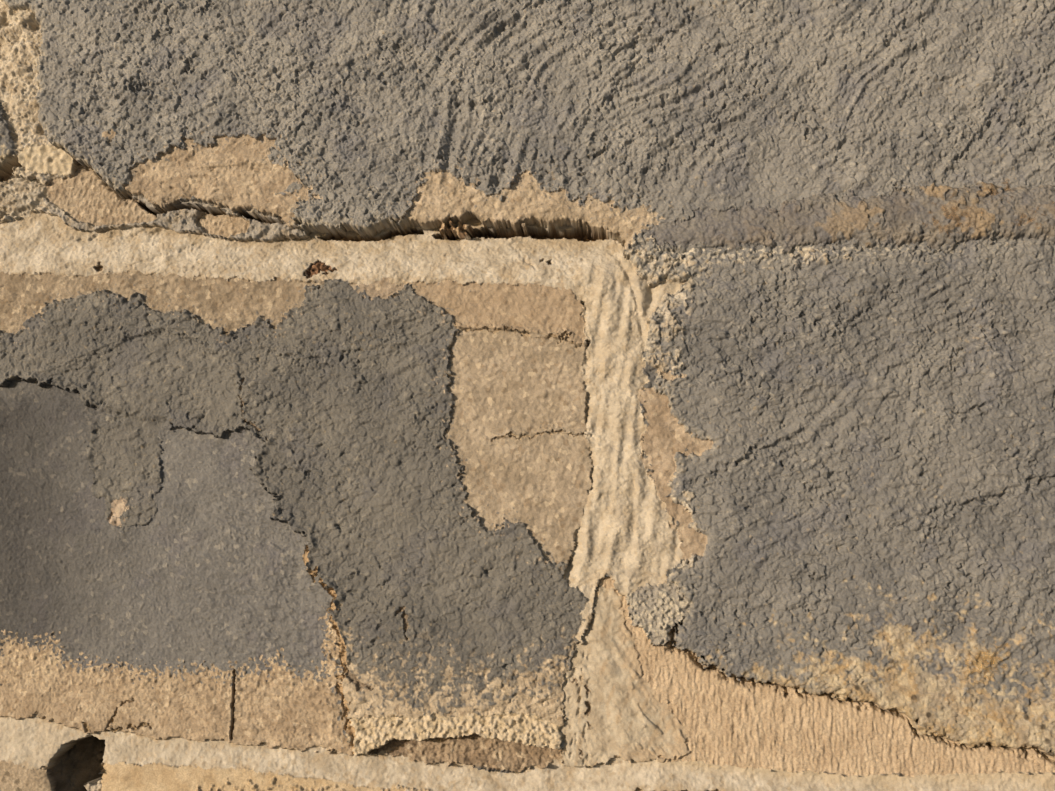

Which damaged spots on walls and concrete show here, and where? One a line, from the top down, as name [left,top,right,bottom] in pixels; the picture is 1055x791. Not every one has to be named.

flaking render [0,0,320,243]
spalling [588,142,610,161]
crack [329,218,608,242]
peeling [403,168,661,250]
peeling [0,261,338,335]
crack [239,379,268,441]
peeling [349,278,594,565]
peeling [106,497,129,528]
crack [303,546,379,756]
crack [396,607,409,641]
flaking render [0,576,1055,778]
crack [48,700,153,791]